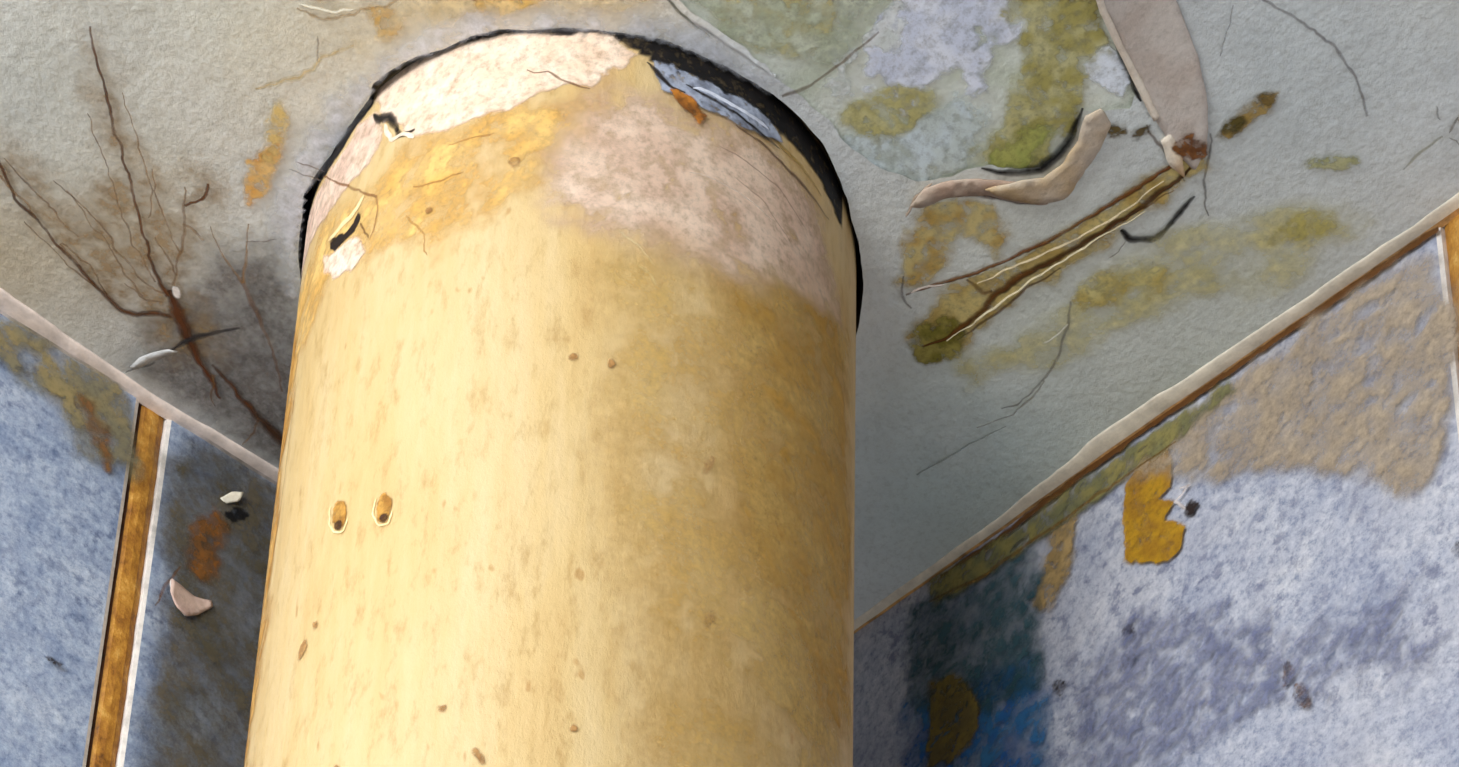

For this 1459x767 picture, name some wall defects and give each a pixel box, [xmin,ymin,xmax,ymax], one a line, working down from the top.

crack [0,26,283,445]
damp [257,0,541,89]
peeling [301,32,824,278]
peeling [668,0,1212,217]
damp [897,198,1006,286]
damp [911,208,1345,374]
crack [1220,0,1367,116]
damp [1129,258,1459,494]
corrosion [1122,448,1199,563]
peeling [170,579,213,616]